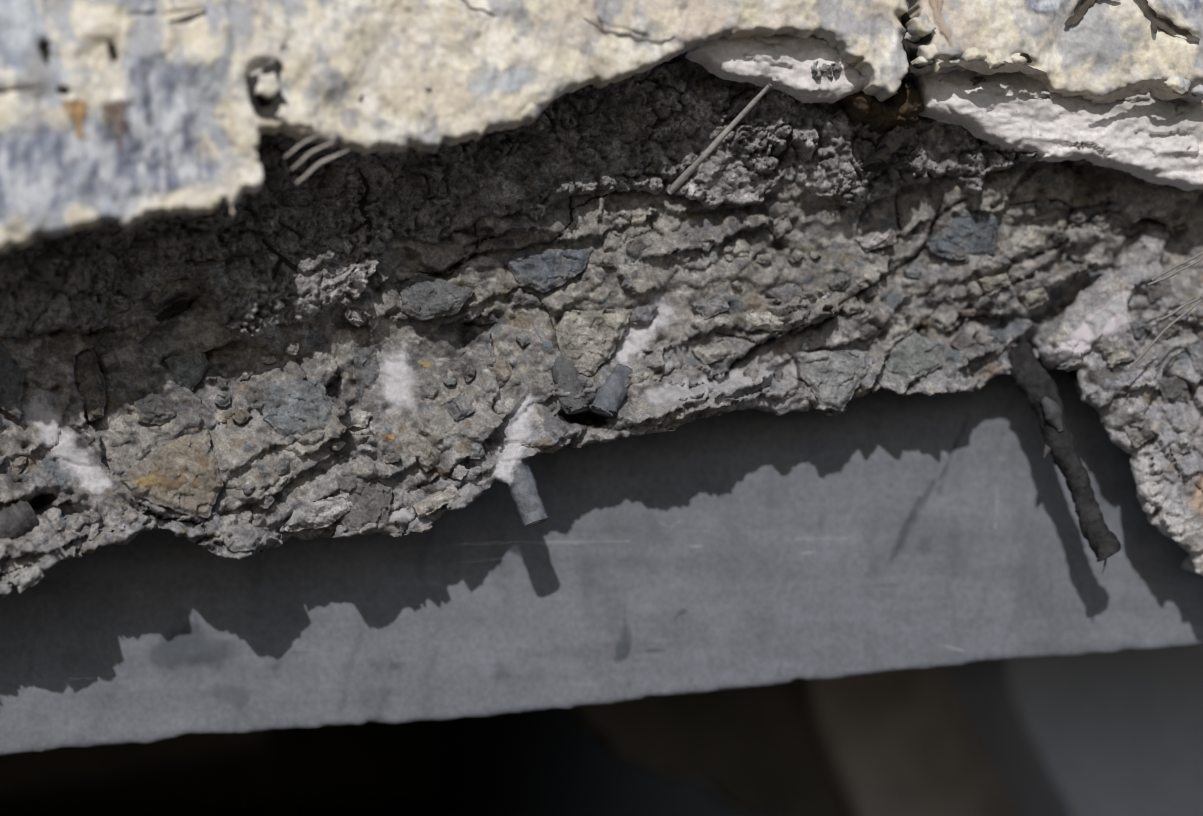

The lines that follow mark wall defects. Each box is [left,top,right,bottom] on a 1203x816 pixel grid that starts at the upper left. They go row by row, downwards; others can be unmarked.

spalling [656,50,688,66]
spalling [245,59,313,127]
spalling [0,160,1203,599]
rust [1008,342,1121,574]
water stain [153,627,226,667]